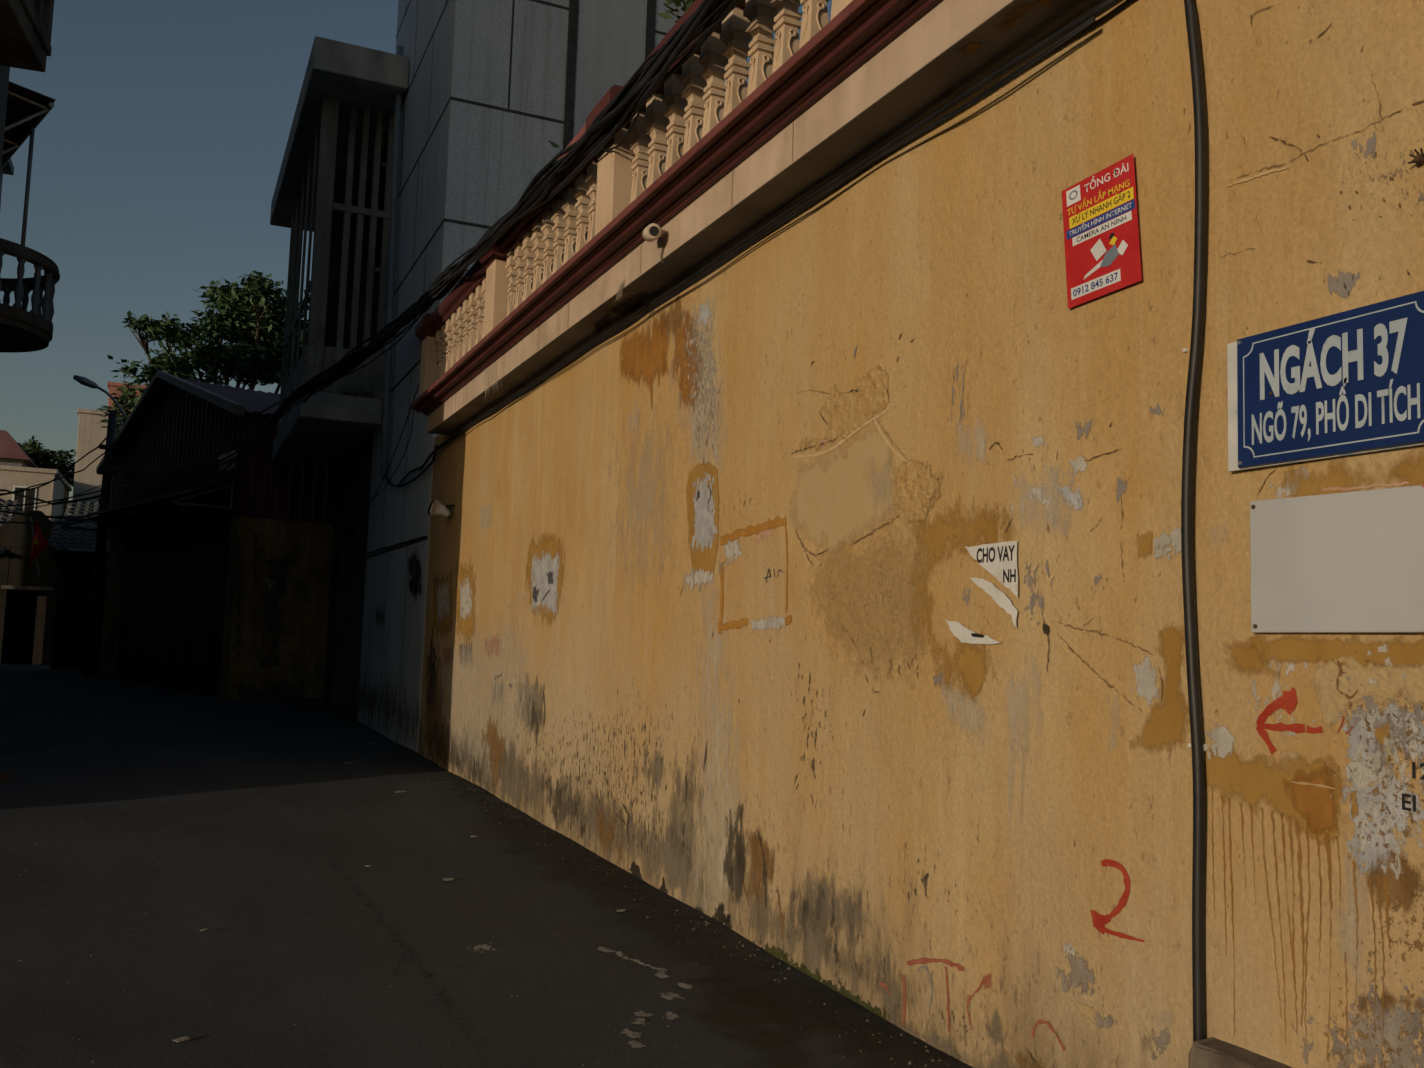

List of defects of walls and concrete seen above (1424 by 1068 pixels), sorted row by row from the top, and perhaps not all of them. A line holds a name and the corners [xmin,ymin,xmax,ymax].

crack [1225,46,1424,187]
peeling [530,550,560,617]
peeling [683,539,742,591]
peeling [1204,637,1424,775]
damp [350,603,919,1026]
damp [903,839,940,900]
rust [1204,748,1419,1068]